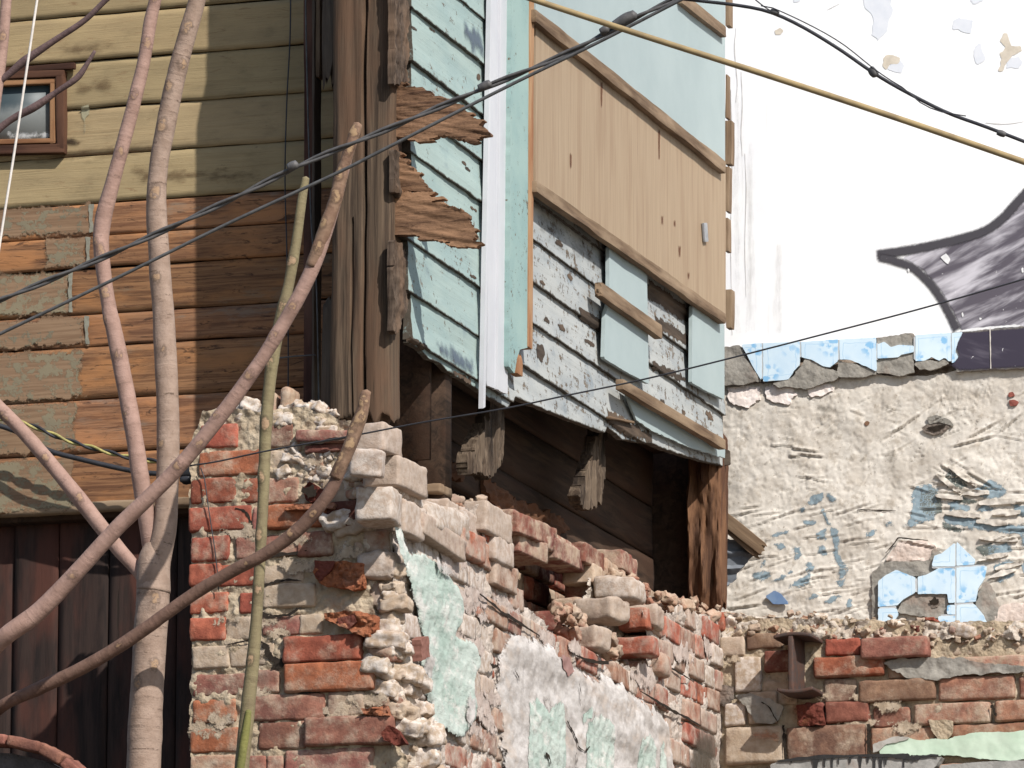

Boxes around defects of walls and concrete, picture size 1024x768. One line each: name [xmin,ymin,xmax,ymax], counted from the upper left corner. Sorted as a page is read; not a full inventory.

peeling [68,272,90,344]
peeling [537,344,545,362]
peeling [578,307,601,347]
peeling [647,279,689,347]
peeling [651,361,686,382]
peeling [727,383,833,408]
spalling [313,560,367,592]
peeling [753,493,852,607]
spalling [886,537,937,562]
peeling [920,480,1024,583]
peeling [395,527,481,737]
peeling [495,633,674,768]